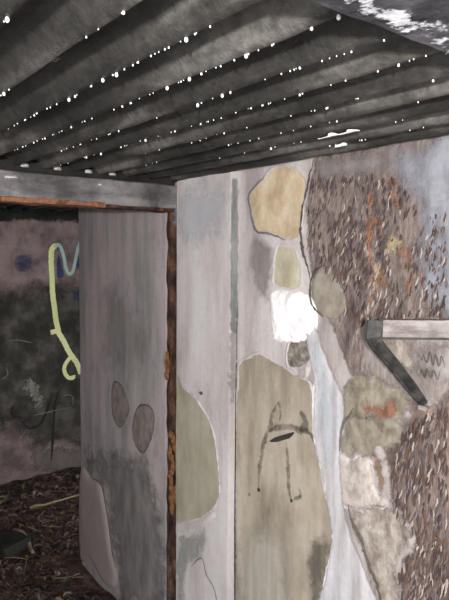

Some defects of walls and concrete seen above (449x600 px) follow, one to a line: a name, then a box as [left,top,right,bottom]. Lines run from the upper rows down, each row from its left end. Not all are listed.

efflorescence [358,0,449,44]
damp [87,450,165,600]
corrosion [168,430,176,516]
spalling [176,375,220,537]
peeling [236,136,449,600]
corrosion [364,399,396,419]